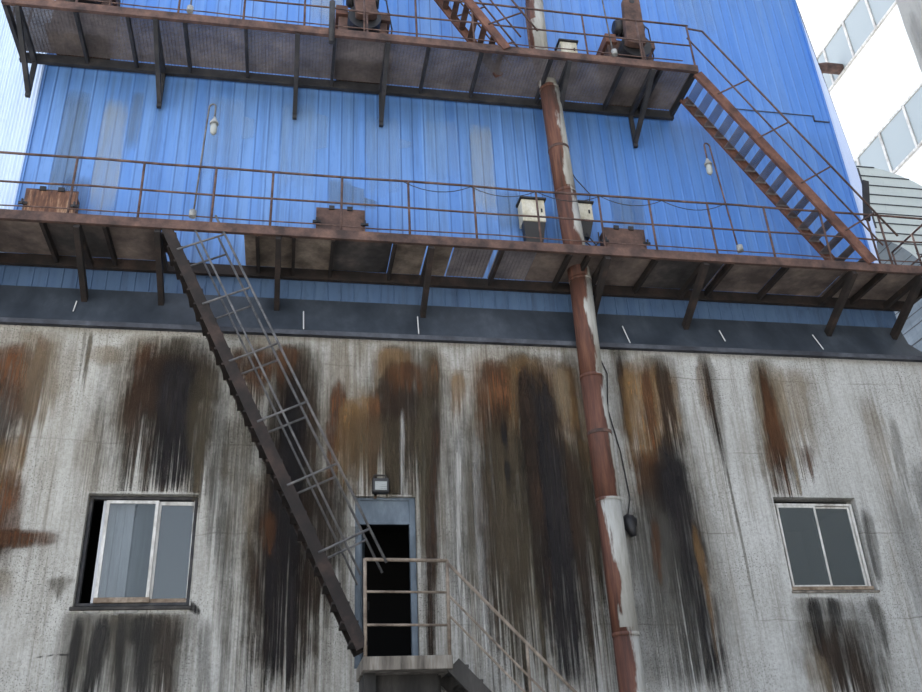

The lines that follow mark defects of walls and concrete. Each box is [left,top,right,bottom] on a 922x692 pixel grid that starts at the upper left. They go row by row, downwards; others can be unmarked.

corrosion [0,345,53,553]
damp [66,616,180,692]
damp [123,347,216,495]
damp [250,474,320,682]
damp [234,346,340,566]
corrosion [326,349,440,655]
damp [617,357,633,459]
corrosion [623,364,725,683]
corrosion [759,370,814,497]
damp [808,598,874,692]
damp [869,600,889,650]